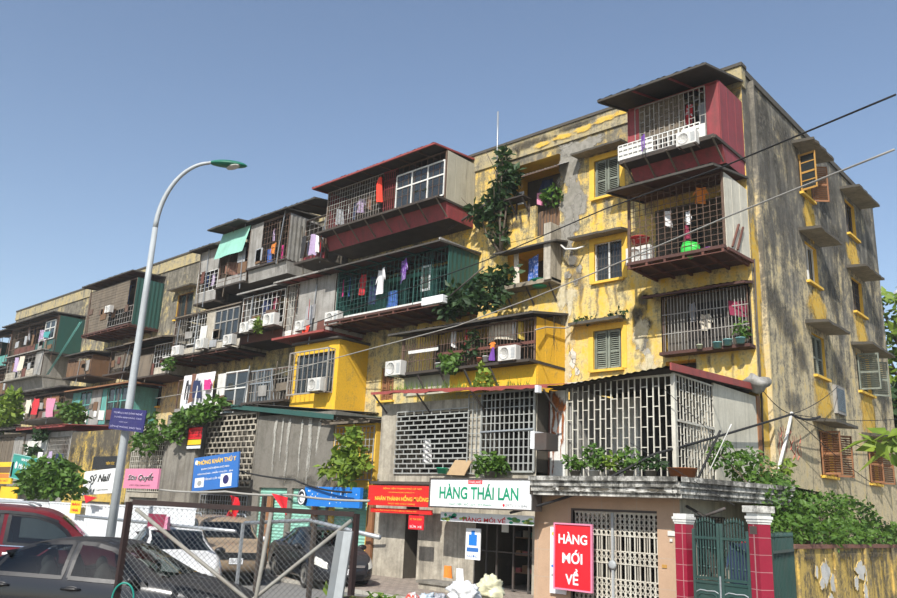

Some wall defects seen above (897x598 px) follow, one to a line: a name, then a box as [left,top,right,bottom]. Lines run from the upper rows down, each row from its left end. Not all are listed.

damp [756,101,794,260]
peeling [535,110,627,383]
peeling [633,317,658,370]
damp [767,285,808,370]
damp [830,274,841,325]
damp [273,418,322,482]
rust [551,392,566,474]
peeling [815,558,836,598]
peeling [854,560,869,598]